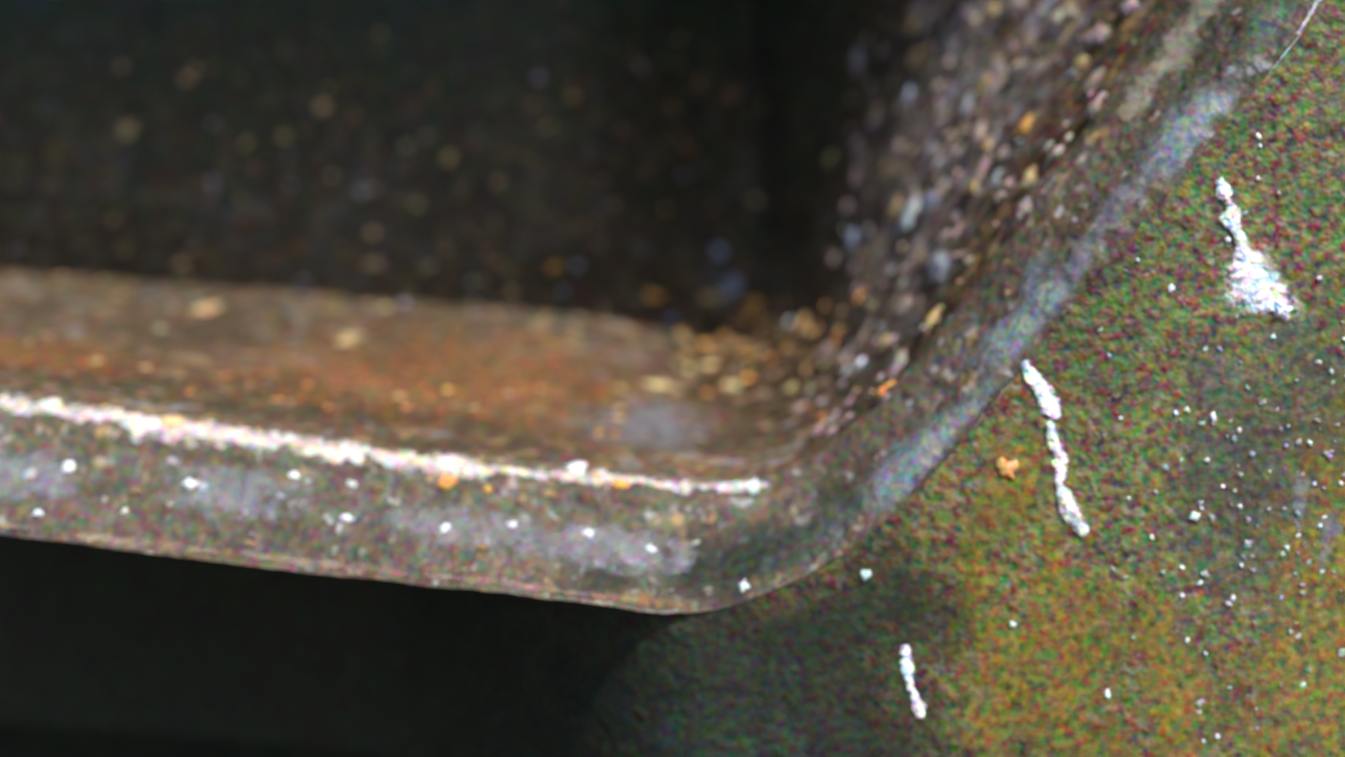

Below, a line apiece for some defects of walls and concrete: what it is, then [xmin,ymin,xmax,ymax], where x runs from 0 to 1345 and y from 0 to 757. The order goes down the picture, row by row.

rust [594,0,1139,440]
efflorescence [1216,177,1297,319]
efflorescence [1022,361,1088,536]
rust [72,534,218,554]
rust [242,539,407,577]
rust [425,574,683,609]
damp [578,571,945,757]